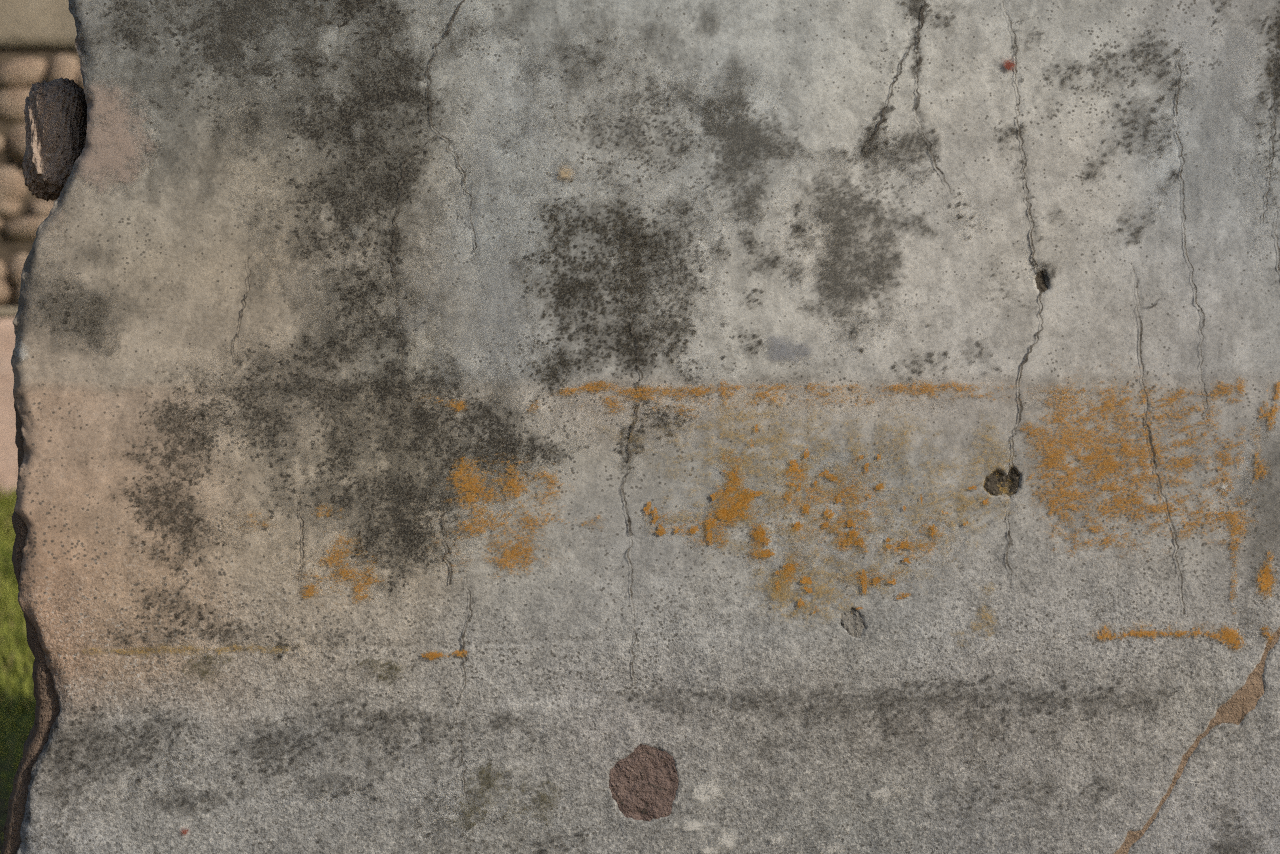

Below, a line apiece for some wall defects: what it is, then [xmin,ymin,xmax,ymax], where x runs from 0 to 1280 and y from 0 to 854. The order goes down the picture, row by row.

crack [867,0,951,193]
leakage [1045,29,1189,180]
leakage [91,0,569,659]
leakage [504,36,1017,621]
rust [556,379,1013,418]
rust [644,424,968,614]
spalling [983,468,1020,497]
crack [1003,5,1043,469]
rust [1018,376,1280,651]
spalling [609,743,734,822]
spalling [701,829,735,854]
crack [1114,627,1280,854]